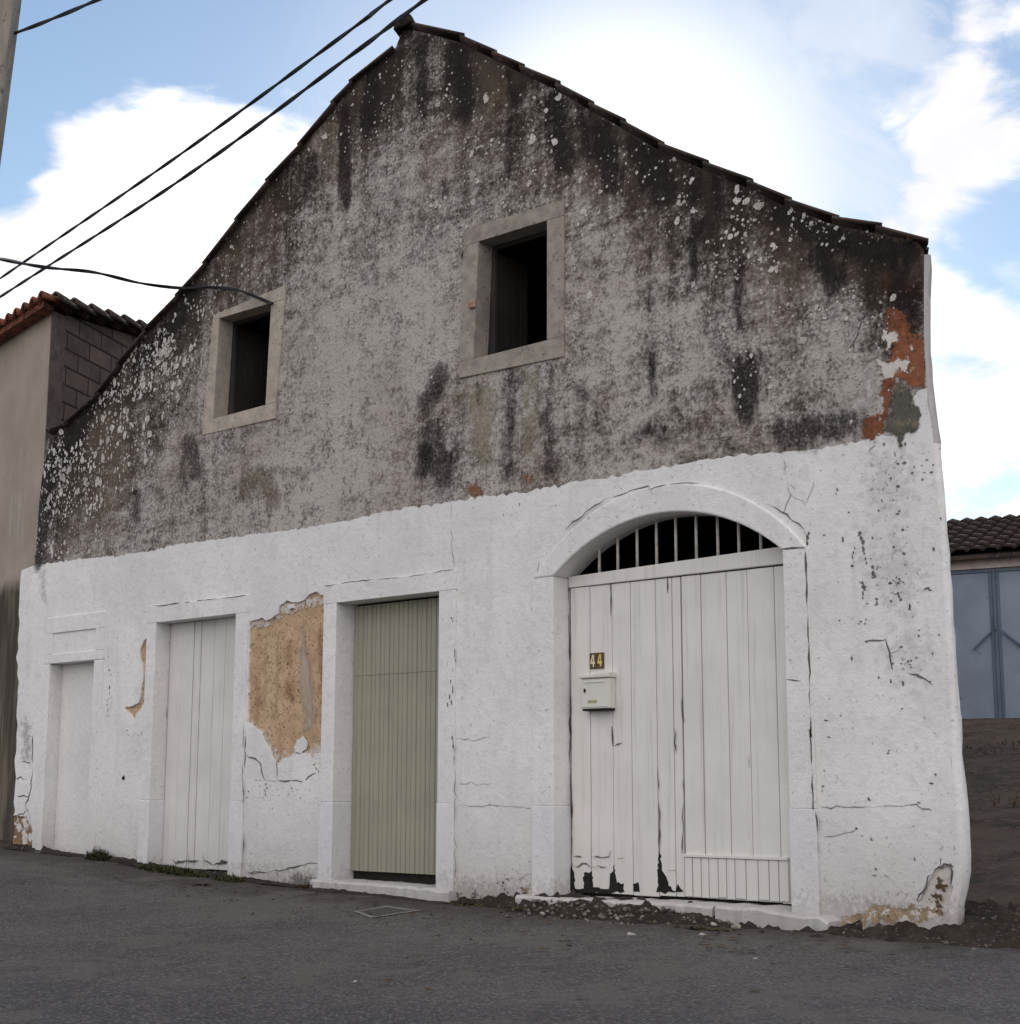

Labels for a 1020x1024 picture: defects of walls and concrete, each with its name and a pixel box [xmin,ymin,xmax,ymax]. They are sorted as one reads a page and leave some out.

water stain [337,62,380,211]
water stain [545,90,722,282]
water stain [772,204,921,329]
water stain [728,351,768,425]
peeling [852,308,934,481]
water stain [35,382,120,569]
crack [537,482,694,572]
peeling [249,592,324,772]
crack [768,461,931,851]
spalling [13,816,32,851]
crack [242,729,321,798]
peeling [842,866,953,930]